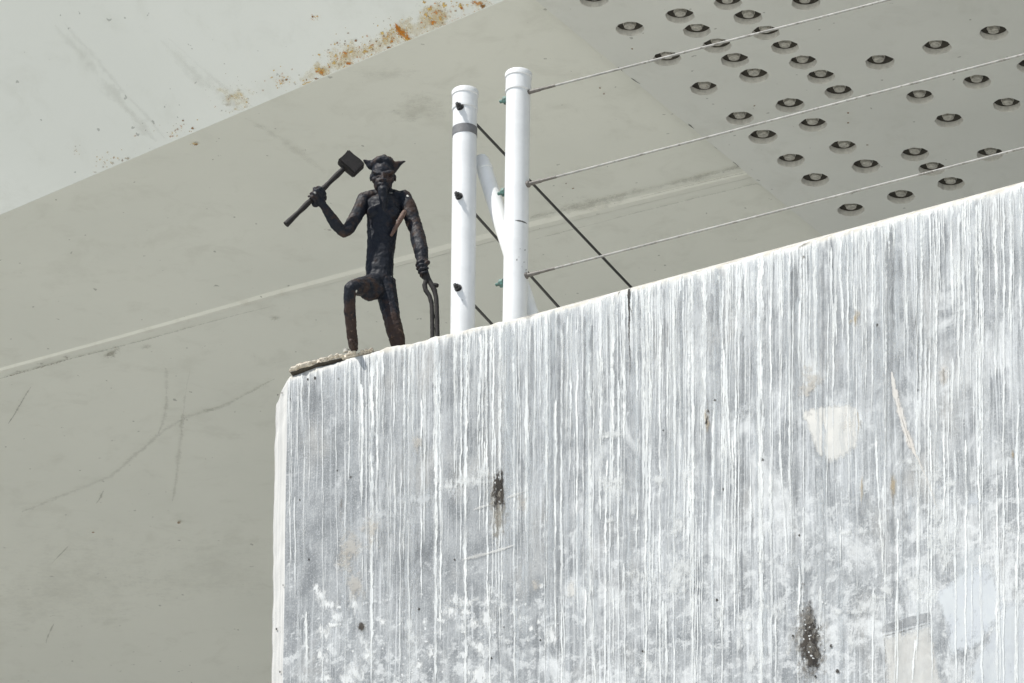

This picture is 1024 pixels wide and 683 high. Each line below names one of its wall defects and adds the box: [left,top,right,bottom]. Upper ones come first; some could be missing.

corrosion [271,1,490,88]
damp [288,185,1024,683]
peeling [803,405,861,461]
corrosion [491,470,505,523]